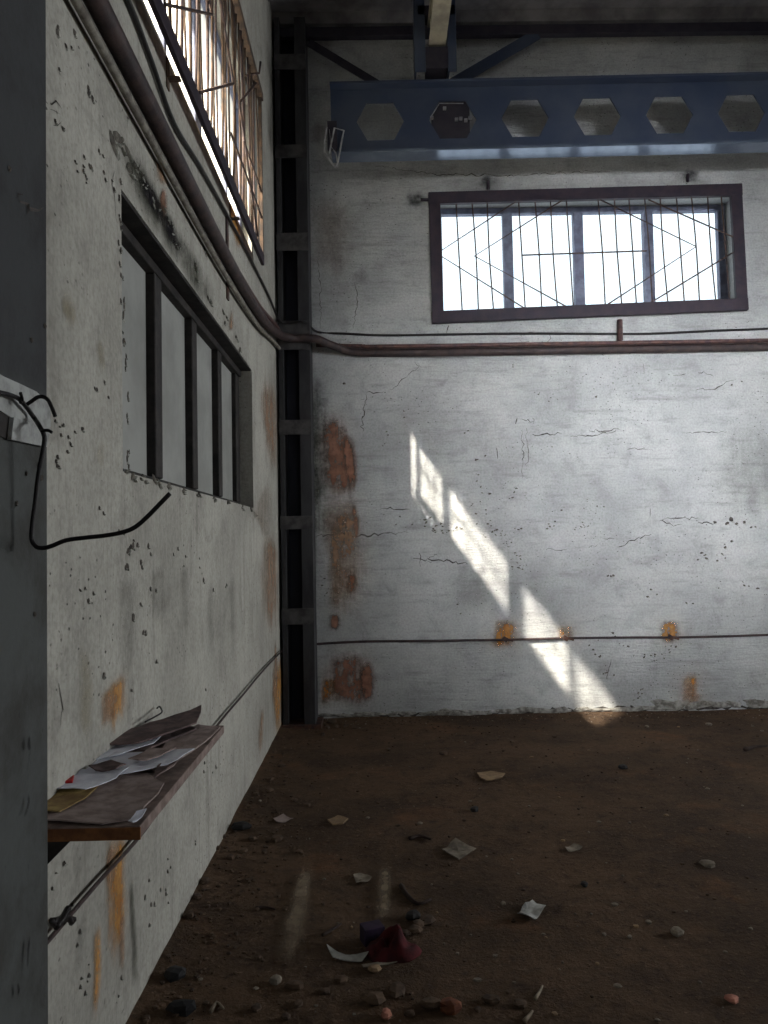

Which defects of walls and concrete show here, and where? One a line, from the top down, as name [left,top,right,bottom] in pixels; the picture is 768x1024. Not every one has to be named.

damp [134,171,181,248]
crack [360,364,421,431]
rust [323,420,356,491]
crack [496,419,650,477]
rust [329,506,359,594]
crack [414,553,466,567]
crack [546,517,715,551]
rust [495,622,514,645]
rust [662,622,678,641]
rust [323,656,373,702]